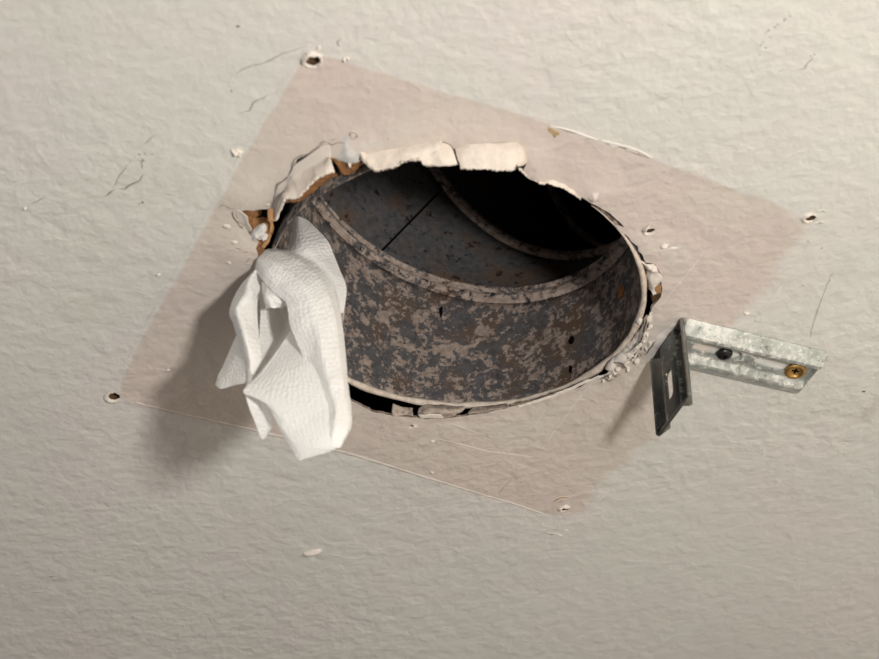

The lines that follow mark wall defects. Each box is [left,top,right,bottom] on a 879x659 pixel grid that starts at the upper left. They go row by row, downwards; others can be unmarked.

crack [103,135,154,197]
peeling [267,140,599,223]
flaking render [518,261,662,407]